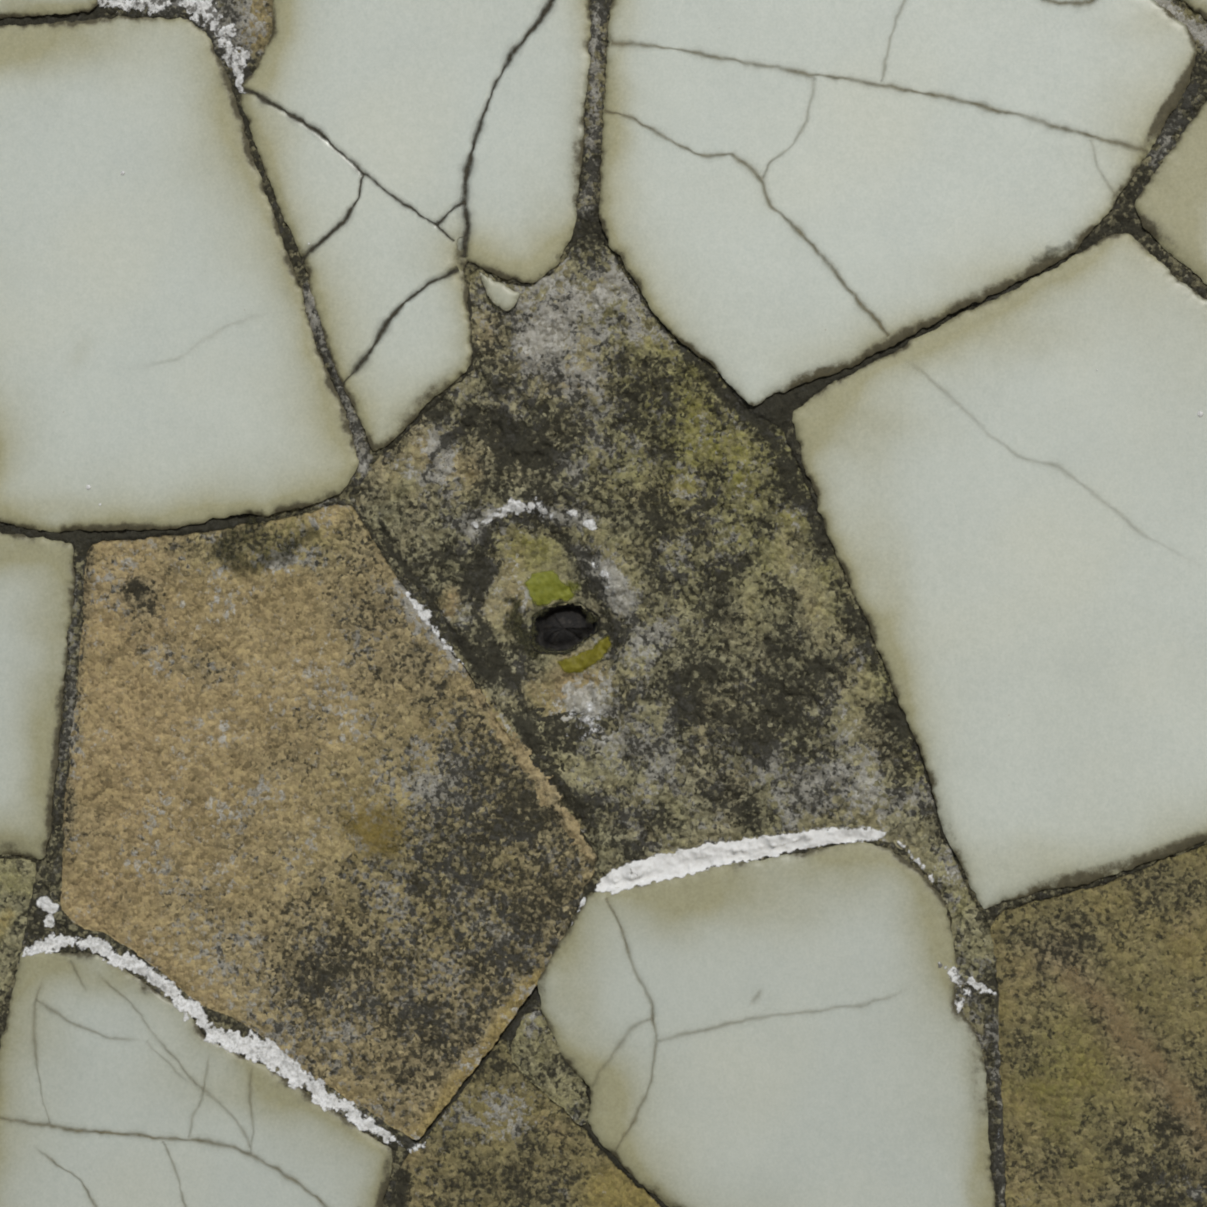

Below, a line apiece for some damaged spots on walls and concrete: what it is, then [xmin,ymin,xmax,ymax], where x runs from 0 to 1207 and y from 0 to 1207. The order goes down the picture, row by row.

leakage [98,0,250,94]
crack [787,69,1011,113]
crack [1050,125,1145,151]
crack [243,0,554,386]
crack [604,109,889,336]
peeling [479,271,520,311]
efflorescence [472,497,597,530]
efflorescence [571,827,934,925]
spalling [0,857,36,1013]
leakage [22,896,426,1153]
spalling [511,1010,590,1125]
crack [23,1121,323,1204]